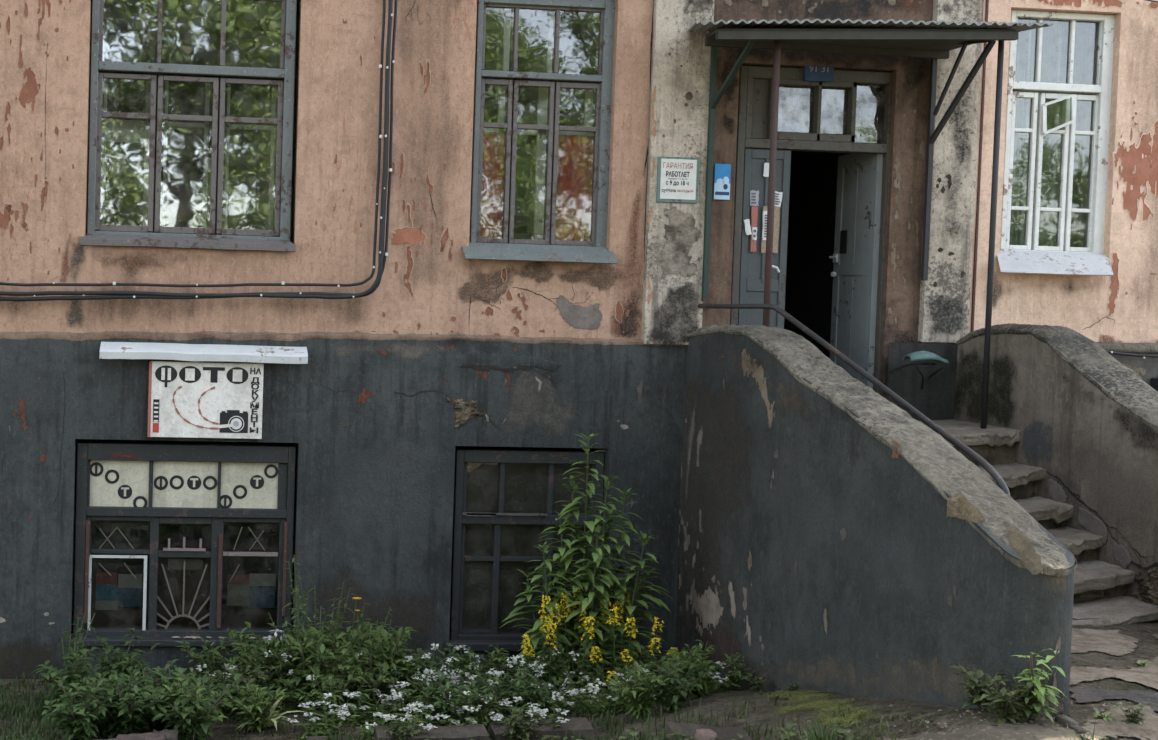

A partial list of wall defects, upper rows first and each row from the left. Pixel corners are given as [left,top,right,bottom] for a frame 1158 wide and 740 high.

peeling [1019,0,1123,10]
peeling [0,0,71,151]
peeling [0,121,74,253]
peeling [390,152,454,298]
flaking render [647,207,702,304]
peeling [1112,101,1158,230]
peeling [469,266,529,352]
flaking render [557,292,640,334]
flaking render [446,371,491,428]
peeling [741,348,775,428]
water stain [954,352,1015,425]
flaking render [1133,566,1158,606]